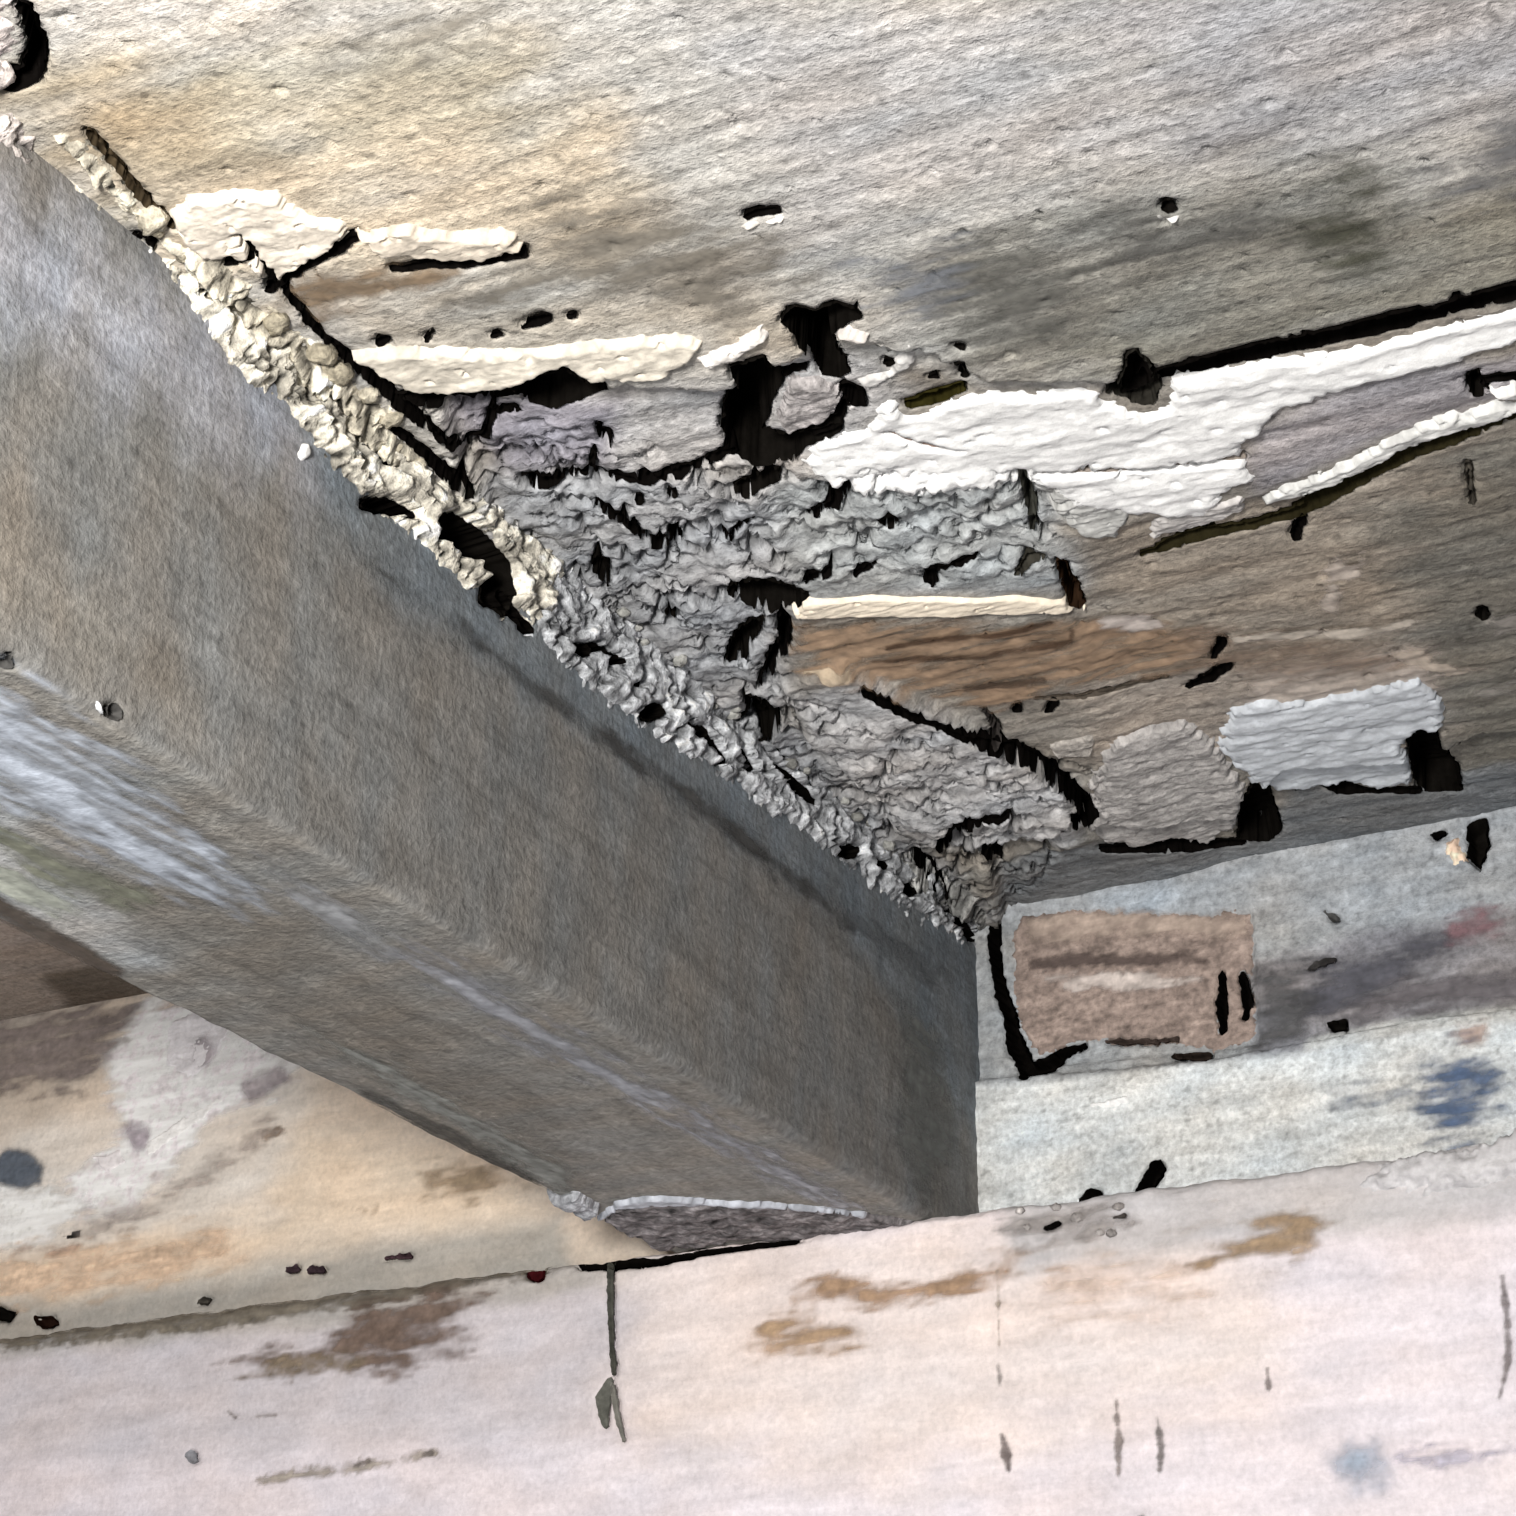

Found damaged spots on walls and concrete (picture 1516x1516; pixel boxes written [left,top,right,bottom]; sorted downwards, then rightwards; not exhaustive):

peeling [169,188,523,323]
hole [740,204,784,230]
spalling [298,443,311,461]
peeling [351,299,1516,539]
spalling [1056,557,1086,609]
peeling [95,701,122,721]
spalling [523,541,987,946]
peeling [1049,648,1463,847]
spalling [1012,909,1336,1061]
spalling [1327,1019,1348,1033]
crack [578,1240,800,1442]